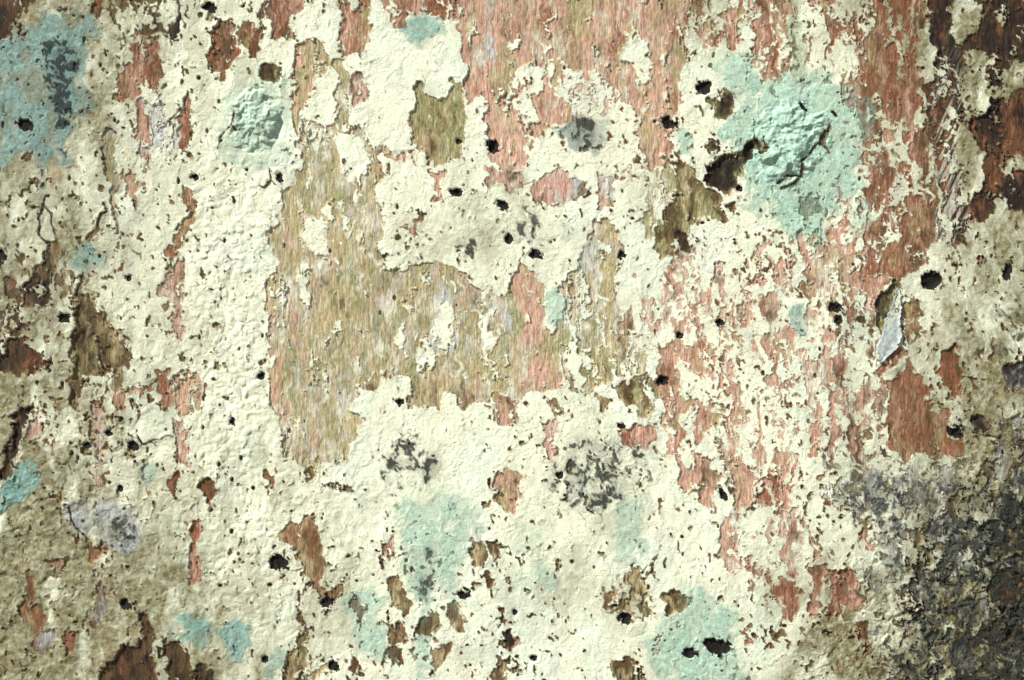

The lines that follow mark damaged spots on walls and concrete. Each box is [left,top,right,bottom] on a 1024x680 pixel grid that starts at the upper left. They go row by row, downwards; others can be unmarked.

spalling [0,0,45,86]
spalling [0,170,57,228]
spalling [196,265,228,341]
spalling [985,269,1024,337]
peeling [192,462,256,517]
spalling [541,459,584,519]
spalling [69,601,222,680]
peeling [174,511,216,587]
spalling [224,508,260,574]
peeling [368,506,546,680]
spalling [524,582,587,658]
water stain [839,444,1024,680]